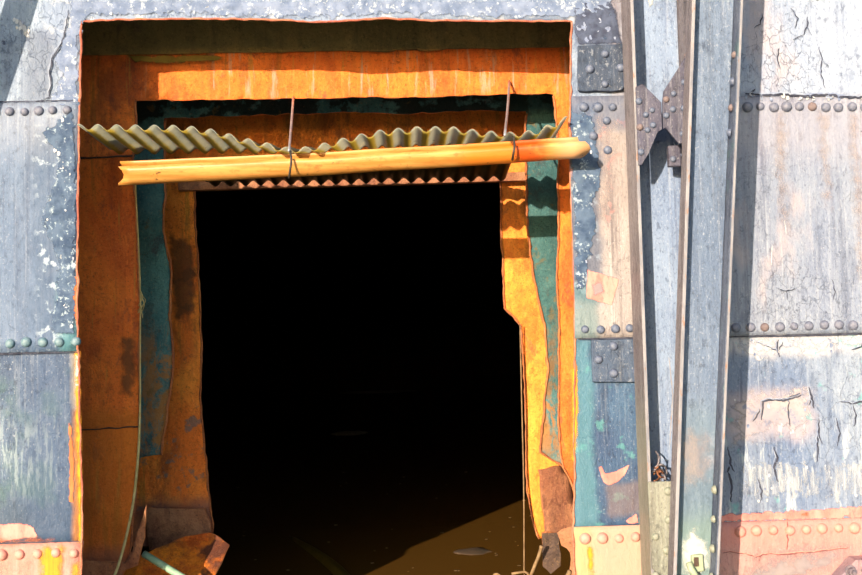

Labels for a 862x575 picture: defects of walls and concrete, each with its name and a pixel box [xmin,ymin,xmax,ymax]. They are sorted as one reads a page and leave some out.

crack [38,10,69,102]
crack [744,8,862,101]
corrosion [170,237,196,319]
corrosion [121,338,135,394]
crack [751,387,862,462]
corrosion [26,539,78,575]
corrosion [123,532,230,575]